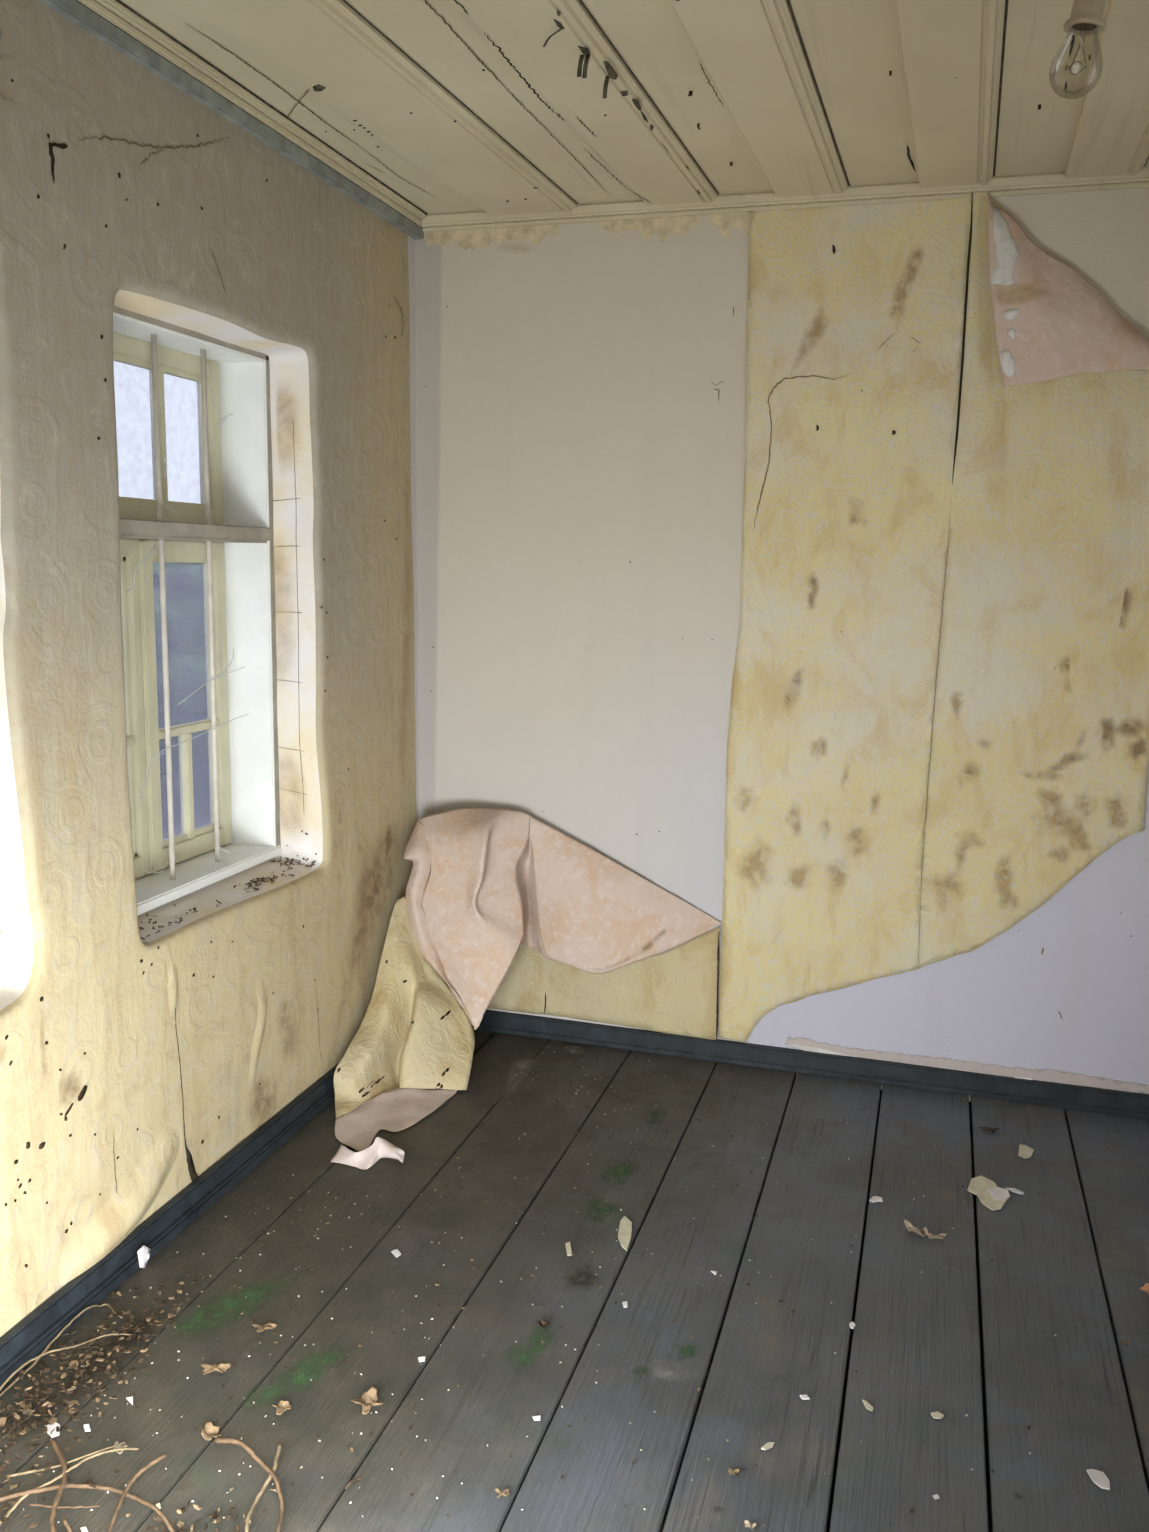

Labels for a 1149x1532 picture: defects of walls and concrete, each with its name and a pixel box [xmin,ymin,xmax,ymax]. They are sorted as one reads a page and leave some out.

crack [78,135,230,164]
peeling [987,191,1149,387]
crack [753,333,920,530]
damp [1103,722,1144,756]
peeling [785,1043,855,1057]